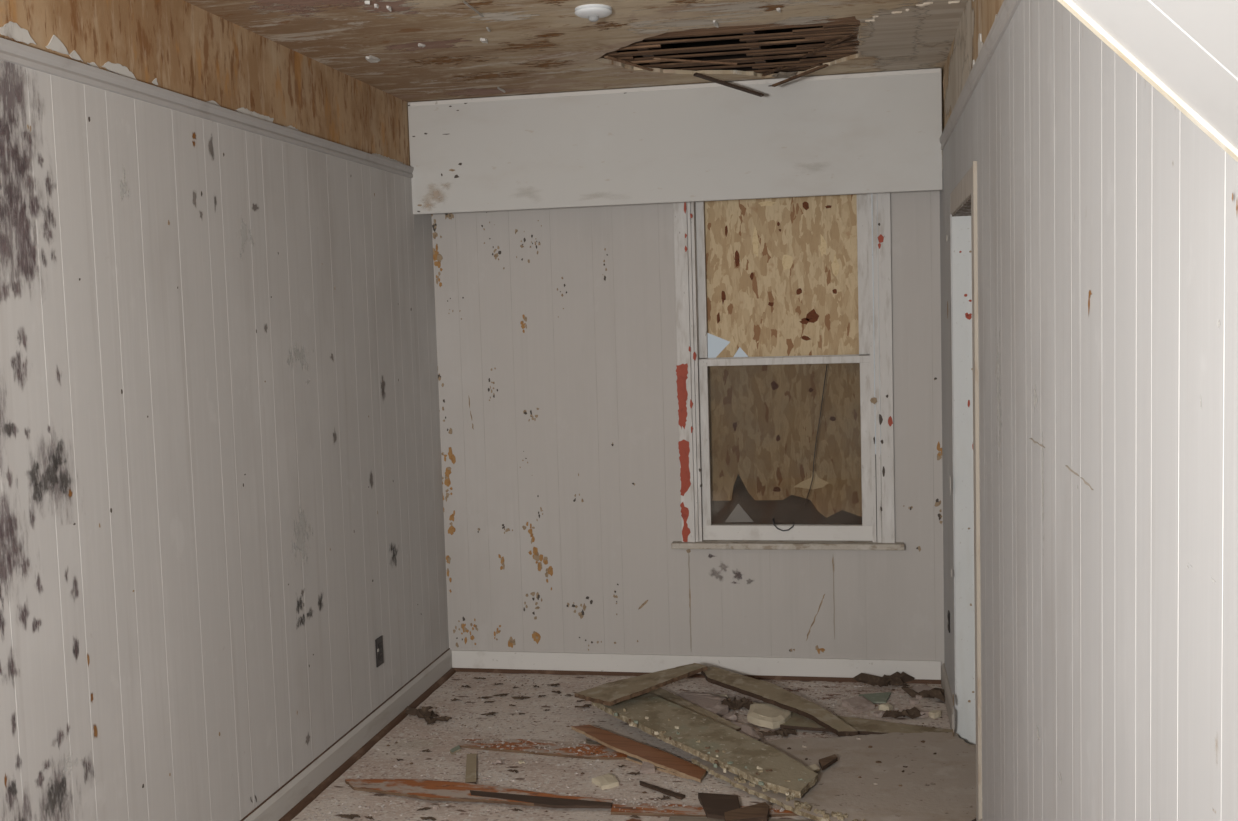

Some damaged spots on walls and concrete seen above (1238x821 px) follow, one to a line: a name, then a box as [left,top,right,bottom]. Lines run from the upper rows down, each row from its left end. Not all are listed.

damp [582,0,832,34]
damp [385,33,574,97]
damp [0,62,56,297]
damp [11,331,27,386]
damp [30,426,71,501]
peeling [437,366,456,535]
damp [0,470,42,598]
peeling [502,495,553,644]
damp [19,607,41,631]
peeling [453,617,478,647]
peeling [567,596,593,619]
damp [8,762,66,821]